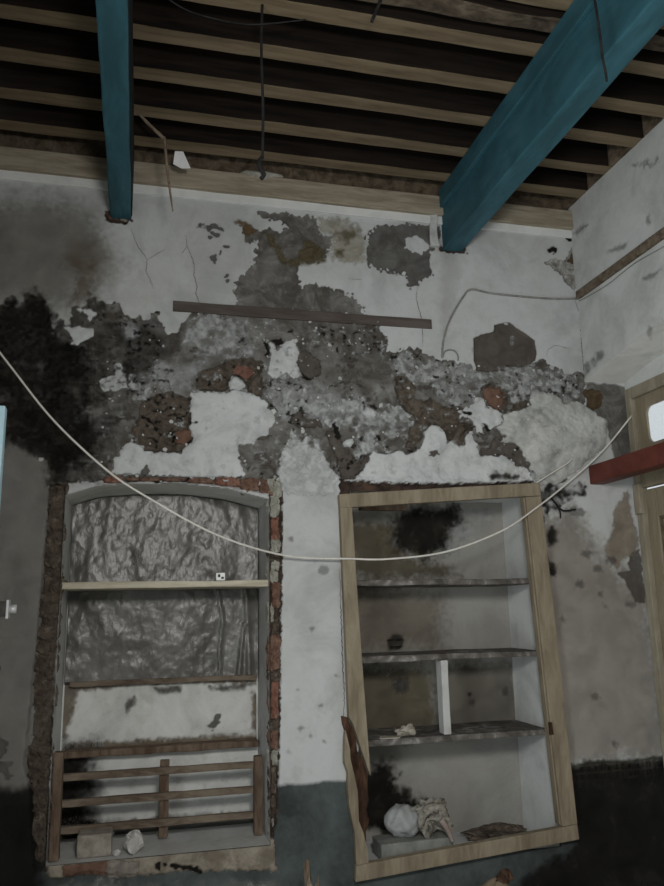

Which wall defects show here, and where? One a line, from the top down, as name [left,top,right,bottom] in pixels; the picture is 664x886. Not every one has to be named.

leakage [0,207,157,886]
flaking render [15,211,631,886]
leakage [522,760,664,886]